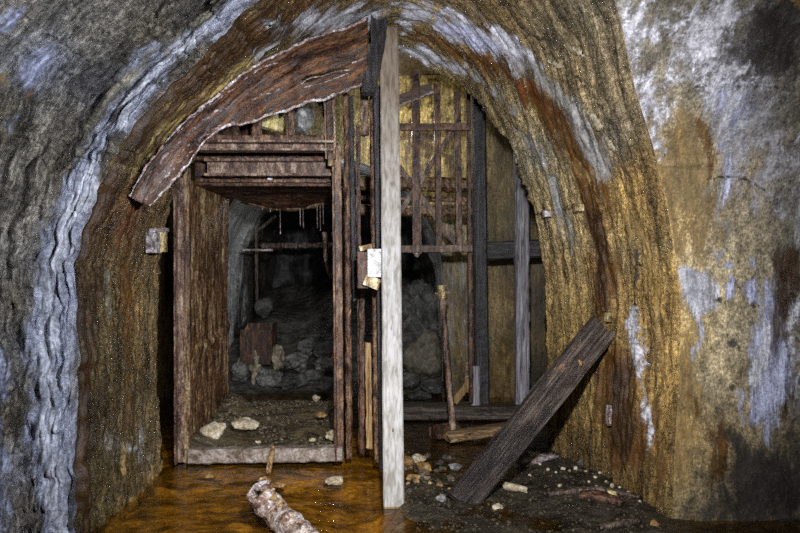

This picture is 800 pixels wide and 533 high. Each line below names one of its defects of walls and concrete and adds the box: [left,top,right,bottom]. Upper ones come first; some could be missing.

corrosion [398,26,621,318]
water stain [621,0,800,226]
crack [707,176,793,191]
water stain [775,187,800,247]
water stain [625,306,655,446]
water stain [678,251,800,524]